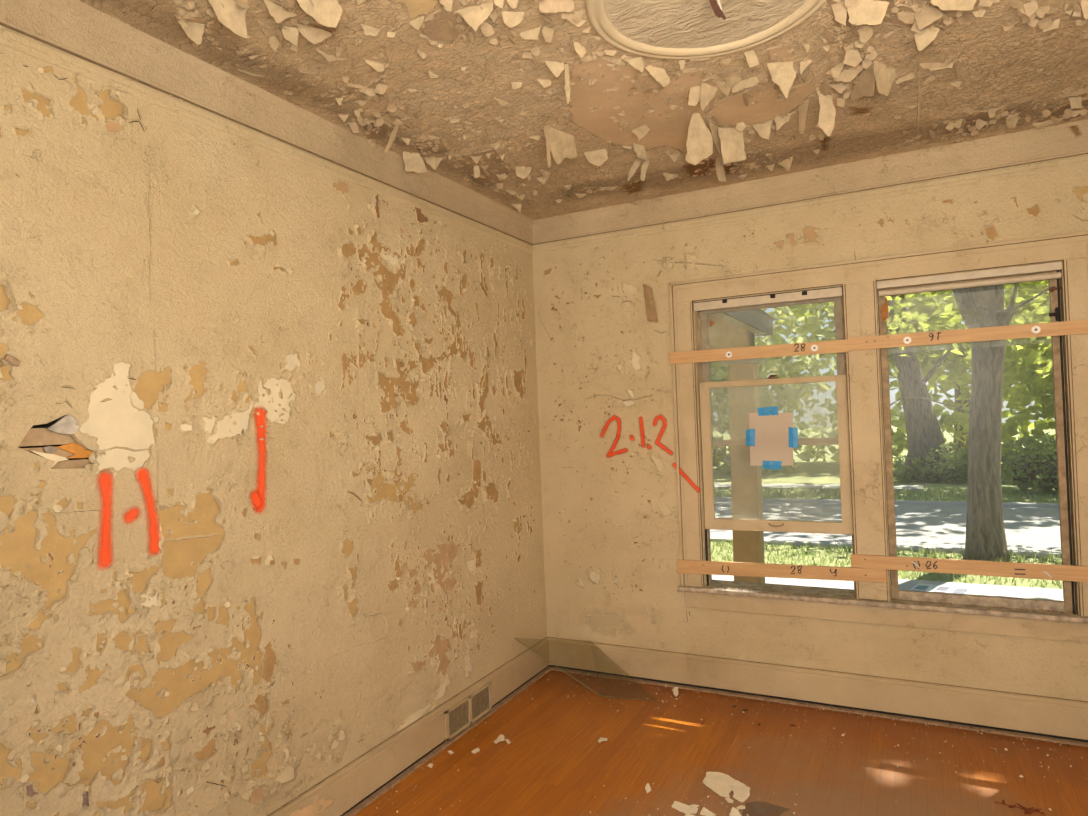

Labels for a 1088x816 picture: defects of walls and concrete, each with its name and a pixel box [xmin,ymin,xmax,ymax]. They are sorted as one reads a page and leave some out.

peeling [168,0,1088,213]
peeling [0,179,670,734]
peeling [0,482,364,816]